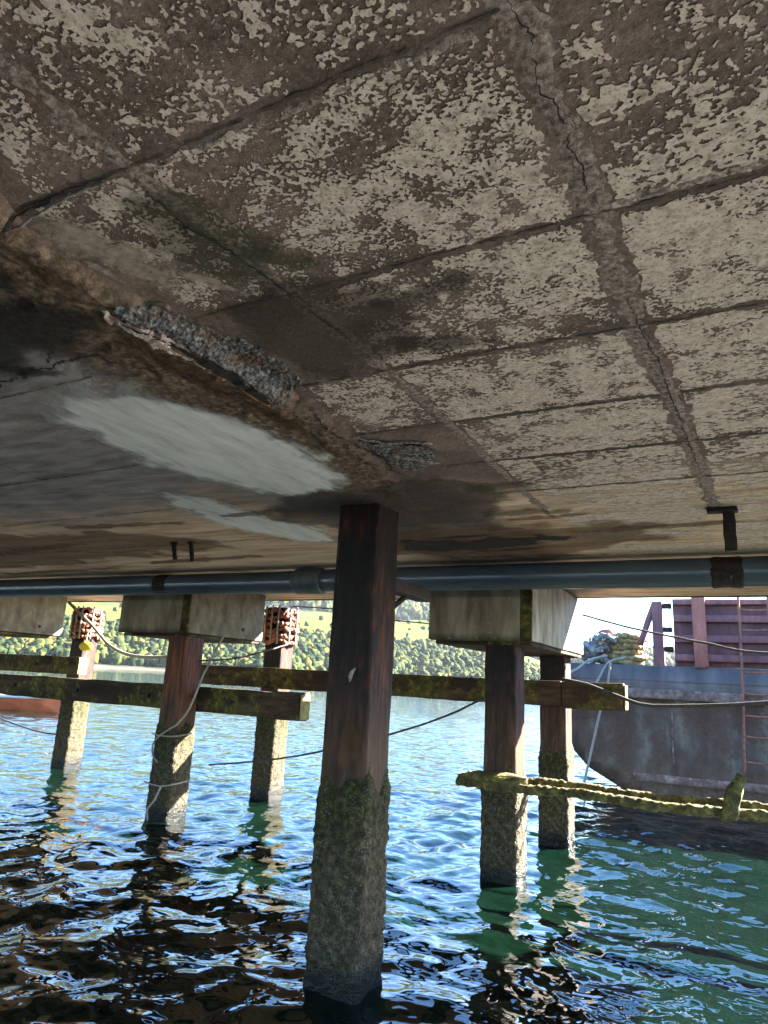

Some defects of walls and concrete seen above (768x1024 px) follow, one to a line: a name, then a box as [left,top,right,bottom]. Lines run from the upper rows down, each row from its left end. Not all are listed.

crack [504,0,604,211]
peeling [0,0,718,554]
crack [612,254,704,481]
peeling [556,0,768,549]
leakage [222,480,571,530]